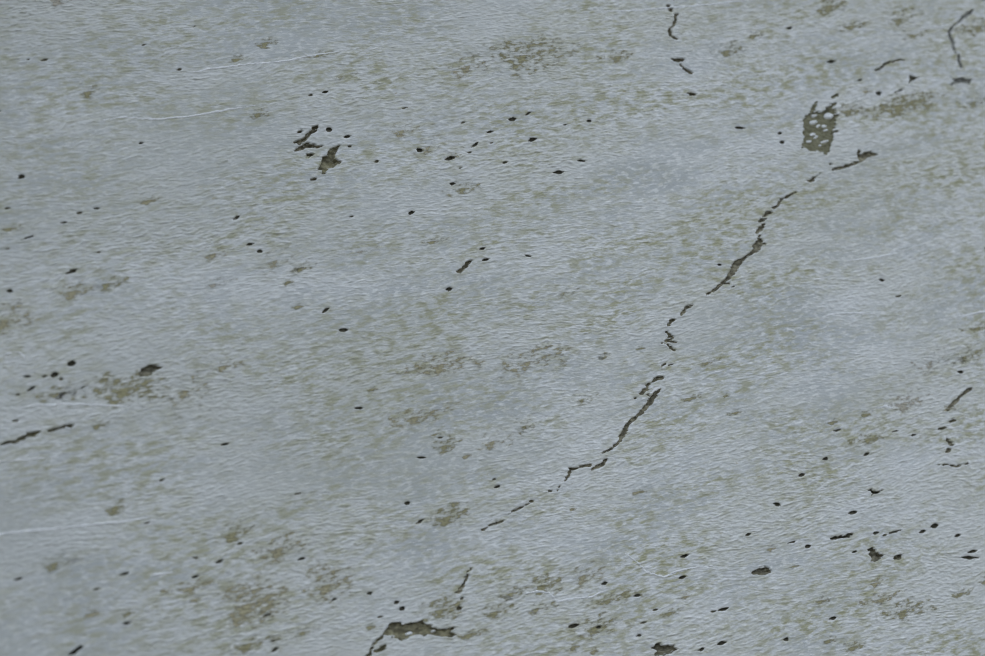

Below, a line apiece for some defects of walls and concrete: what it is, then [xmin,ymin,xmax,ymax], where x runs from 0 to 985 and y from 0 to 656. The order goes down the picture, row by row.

crack [667,5,696,96]
crack [947,0,985,85]
spalling [293,126,351,181]
spalling [801,94,839,155]
crack [481,150,877,531]
crack [366,568,472,656]